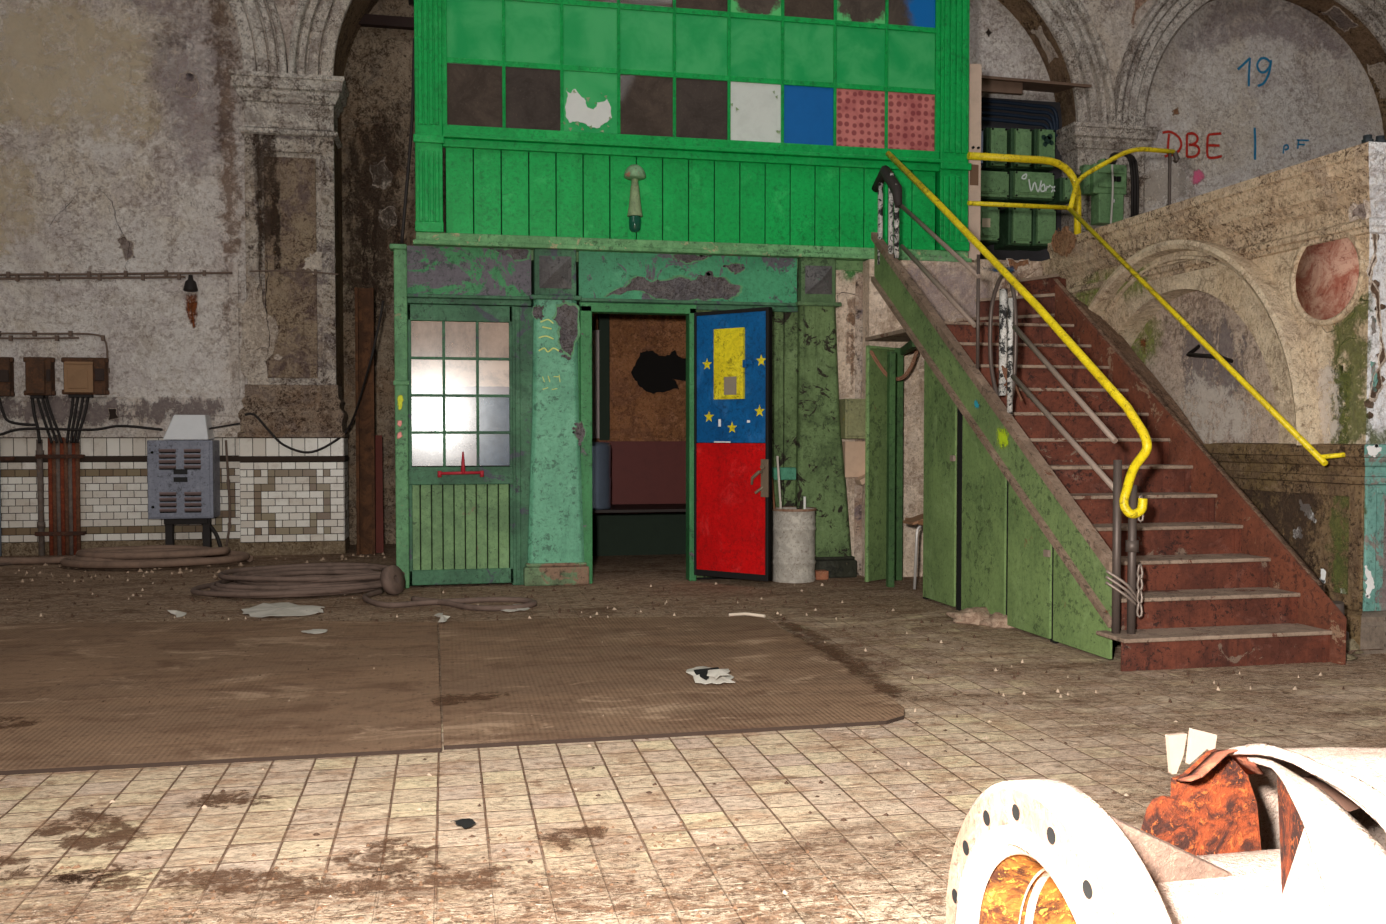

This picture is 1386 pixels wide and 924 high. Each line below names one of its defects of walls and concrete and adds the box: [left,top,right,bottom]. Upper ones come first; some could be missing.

peeling [604,254,745,301]
spalling [1348,199,1386,419]
water stain [1317,294,1386,444]
peeling [1366,444,1382,457]
peeling [1364,565,1375,598]